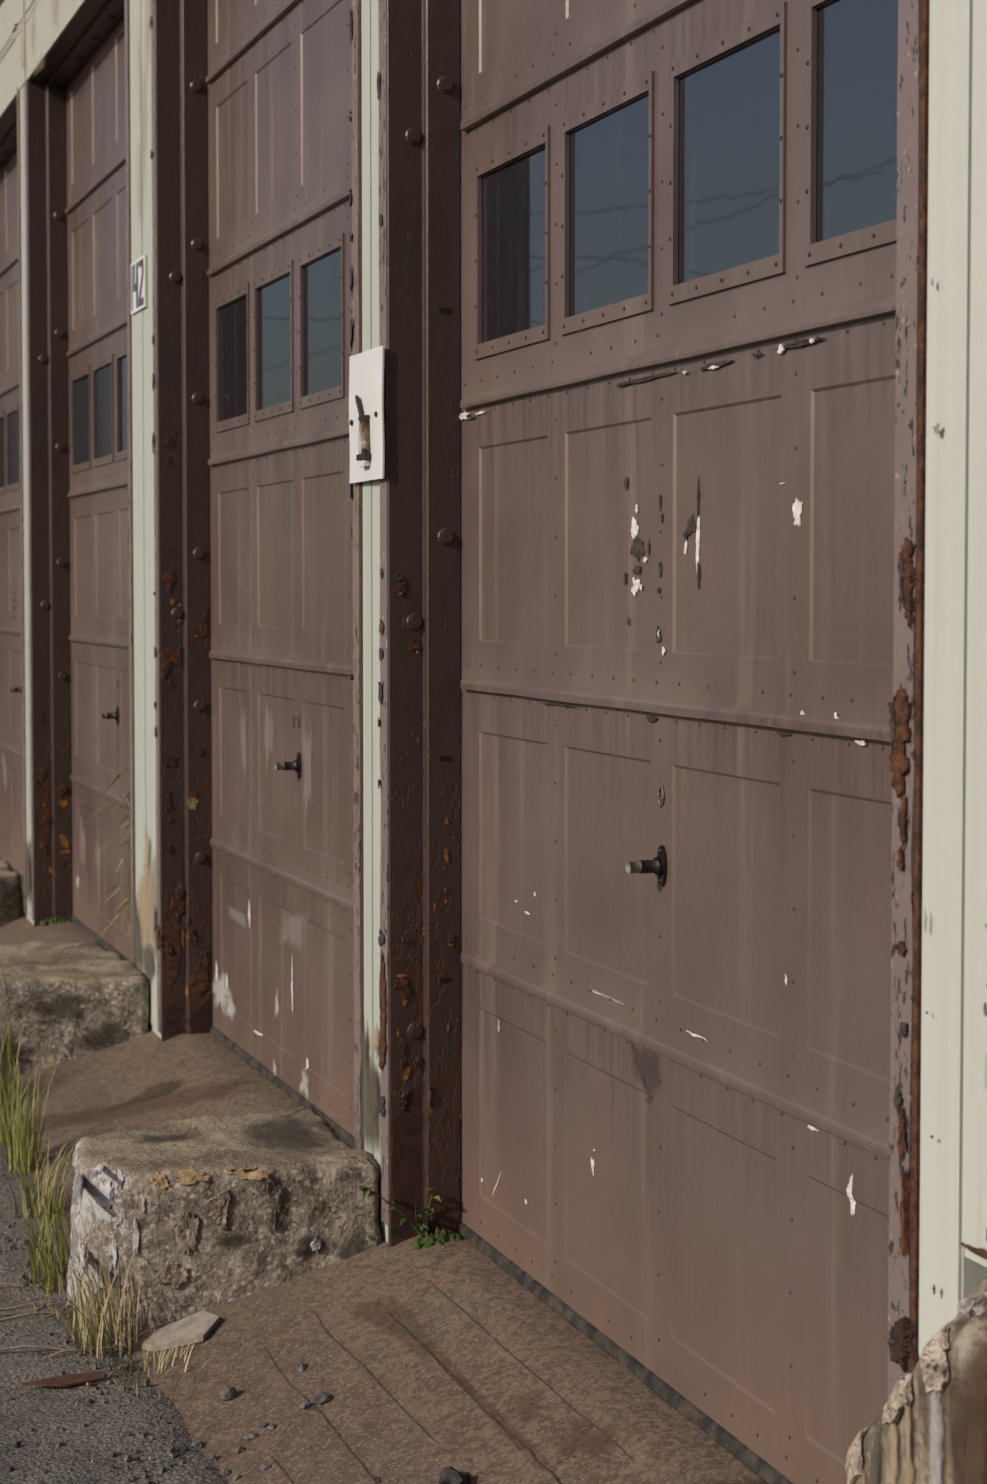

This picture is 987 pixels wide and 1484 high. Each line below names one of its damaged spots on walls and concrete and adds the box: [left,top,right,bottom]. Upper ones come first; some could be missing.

peeling [616,338,824,387]
rust [161,548,182,688]
peeling [623,505,662,596]
peeling [683,477,700,590]
rust [897,537,917,628]
rust [889,687,915,871]
rust [163,909,209,997]
rust [378,929,423,1081]
rust [960,1242,987,1260]
spalling [956,1292,987,1317]
spalling [845,1326,950,1484]